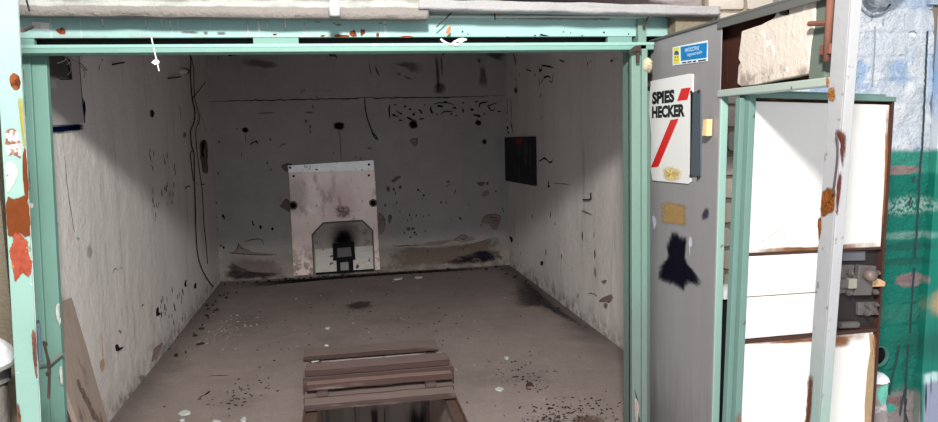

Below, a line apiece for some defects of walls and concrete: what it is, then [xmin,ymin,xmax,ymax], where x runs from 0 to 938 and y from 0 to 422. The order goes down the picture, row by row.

peeling [5,129,21,192]
rust [836,131,846,162]
rust [767,174,842,252]